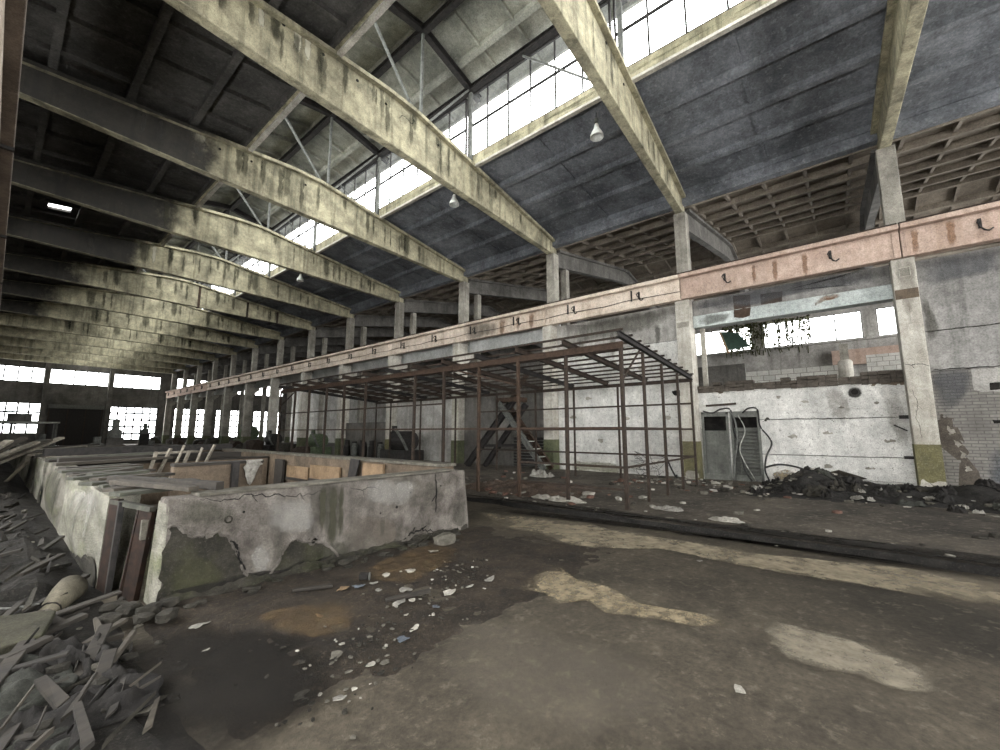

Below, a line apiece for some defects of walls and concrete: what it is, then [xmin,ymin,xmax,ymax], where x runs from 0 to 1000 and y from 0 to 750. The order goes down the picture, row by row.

leakage [249,3,327,87]
leakage [373,86,390,131]
leakage [236,150,248,174]
leakage [278,168,304,206]
leakage [366,212,420,259]
leakage [163,249,259,315]
spalling [937,412,983,486]
crack [200,490,325,502]
leakage [319,492,343,540]
crack [397,474,437,542]
spalling [156,524,249,602]
spalling [269,536,339,574]